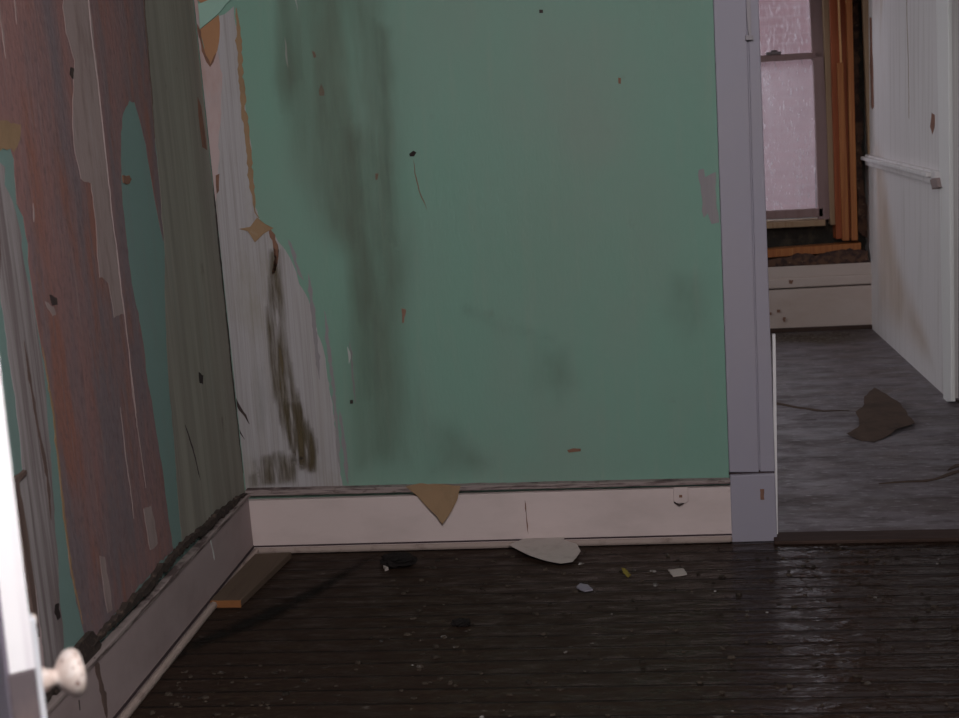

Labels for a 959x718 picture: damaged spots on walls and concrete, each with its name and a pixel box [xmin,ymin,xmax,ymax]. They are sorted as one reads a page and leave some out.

peeling [0,0,349,670]
damp [264,252,314,483]